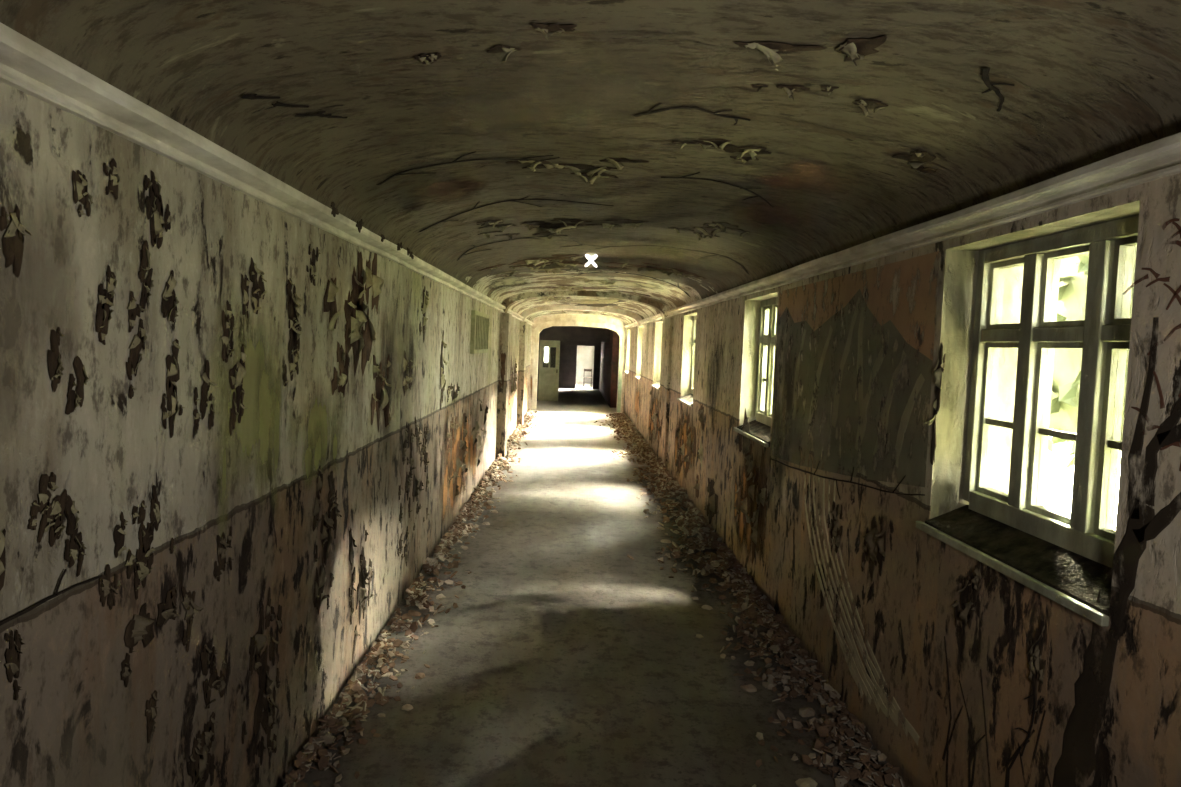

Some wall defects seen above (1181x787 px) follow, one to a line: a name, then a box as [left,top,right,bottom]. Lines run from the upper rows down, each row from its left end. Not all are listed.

spalling [734,36,887,66]
peeling [671,138,771,164]
peeling [48,327,89,415]
peeling [96,265,117,345]
peeling [126,171,179,399]
peeling [161,257,267,438]
peeling [284,278,302,387]
spalling [307,234,414,432]
peeling [419,286,430,343]
peeling [479,254,706,316]
spalling [398,417,430,566]
peeling [313,466,374,664]